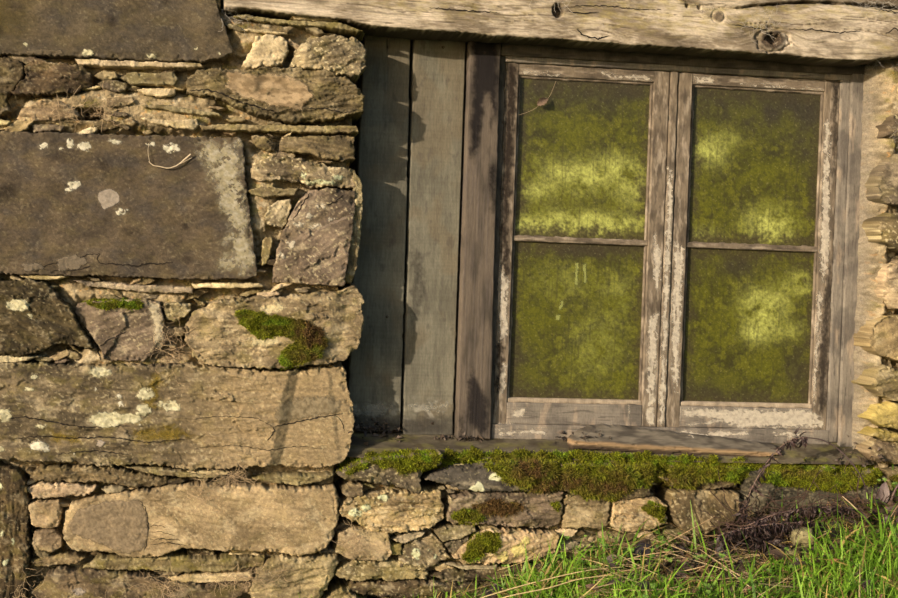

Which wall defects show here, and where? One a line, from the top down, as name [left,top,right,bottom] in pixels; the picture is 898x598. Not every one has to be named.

leakage [470,42,517,276]
peeling [820,122,831,281]
crack [0,413,344,455]
leakage [495,344,505,390]
peeling [500,363,508,393]
peeling [499,272,510,339]
peeling [646,168,685,425]
peeling [681,292,823,439]